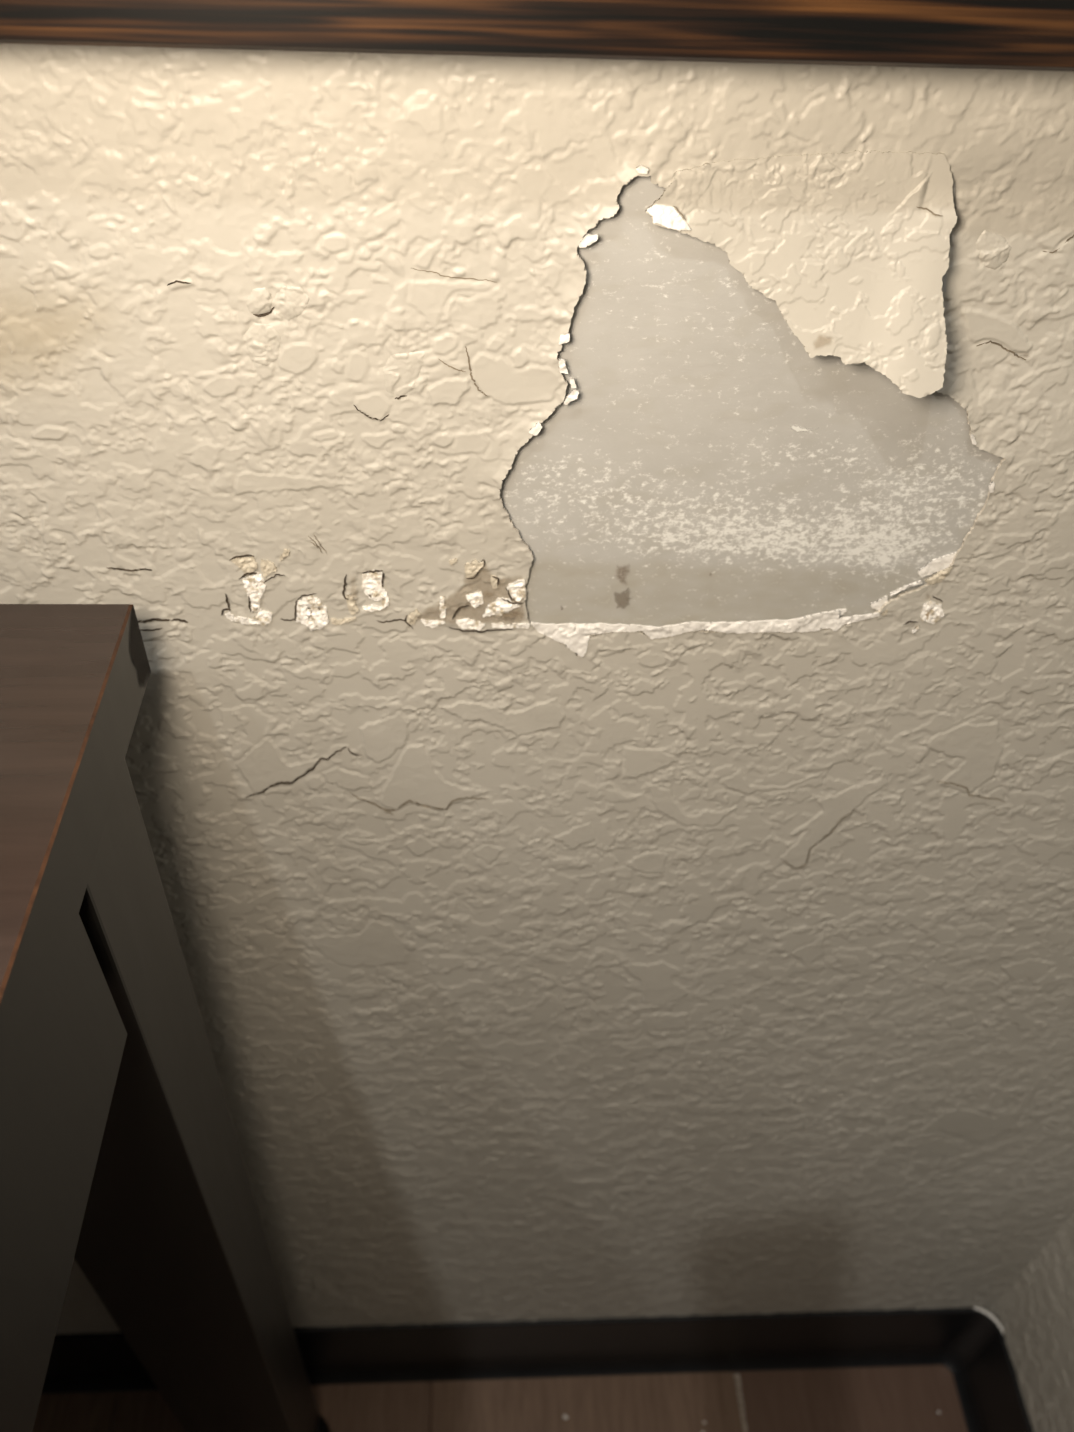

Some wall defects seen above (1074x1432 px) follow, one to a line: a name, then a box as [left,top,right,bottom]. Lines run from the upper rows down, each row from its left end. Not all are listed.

peeling [404,150,1004,657]
spalling [221,549,290,626]
spalling [294,570,389,631]